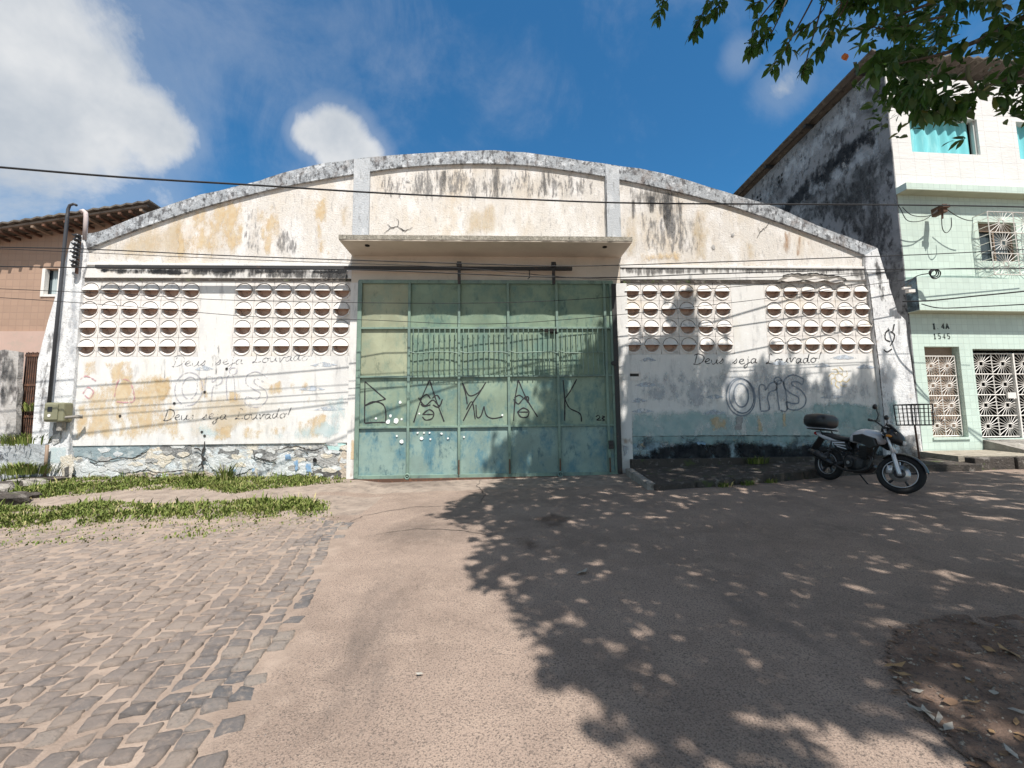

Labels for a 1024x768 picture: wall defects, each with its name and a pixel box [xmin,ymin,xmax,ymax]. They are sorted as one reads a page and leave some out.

leakage [382,168,591,199]
leakage [780,92,890,246]
leakage [278,231,296,252]
leakage [630,189,701,252]
leakage [622,266,863,279]
leakage [0,359,16,406]
peeling [50,362,354,479]
leakage [633,442,858,459]